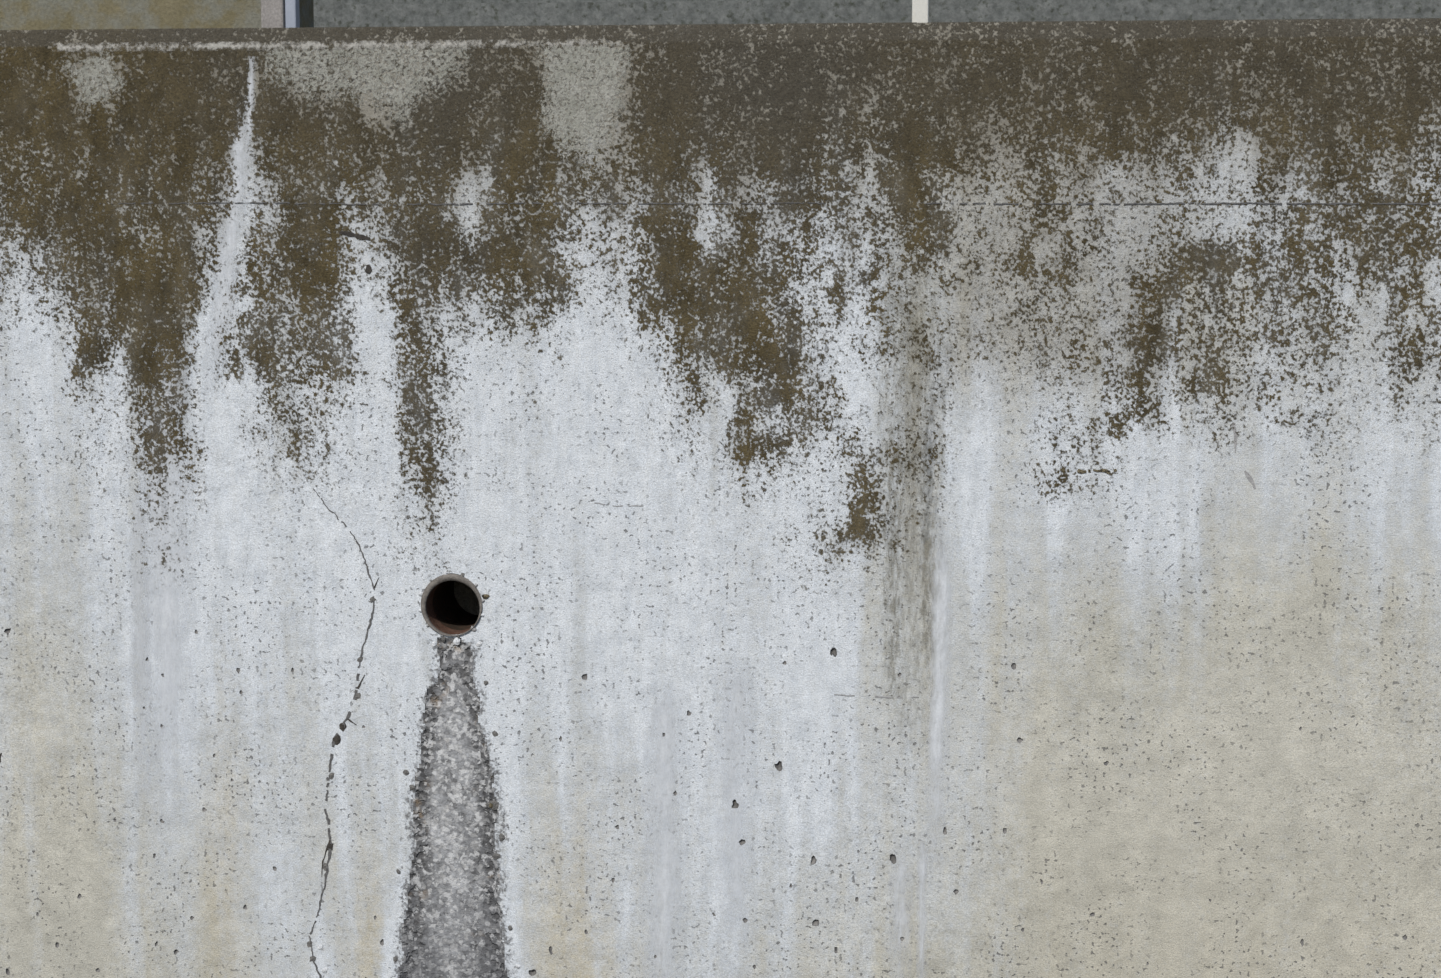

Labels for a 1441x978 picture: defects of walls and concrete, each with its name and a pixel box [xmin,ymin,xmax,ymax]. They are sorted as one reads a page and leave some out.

leakage [61,349,208,737]
leakage [211,57,367,502]
leakage [391,319,458,572]
leakage [647,292,952,592]
leakage [1047,385,1113,508]
leakage [1139,351,1269,451]
crack [307,488,379,978]
crack [834,692,919,700]